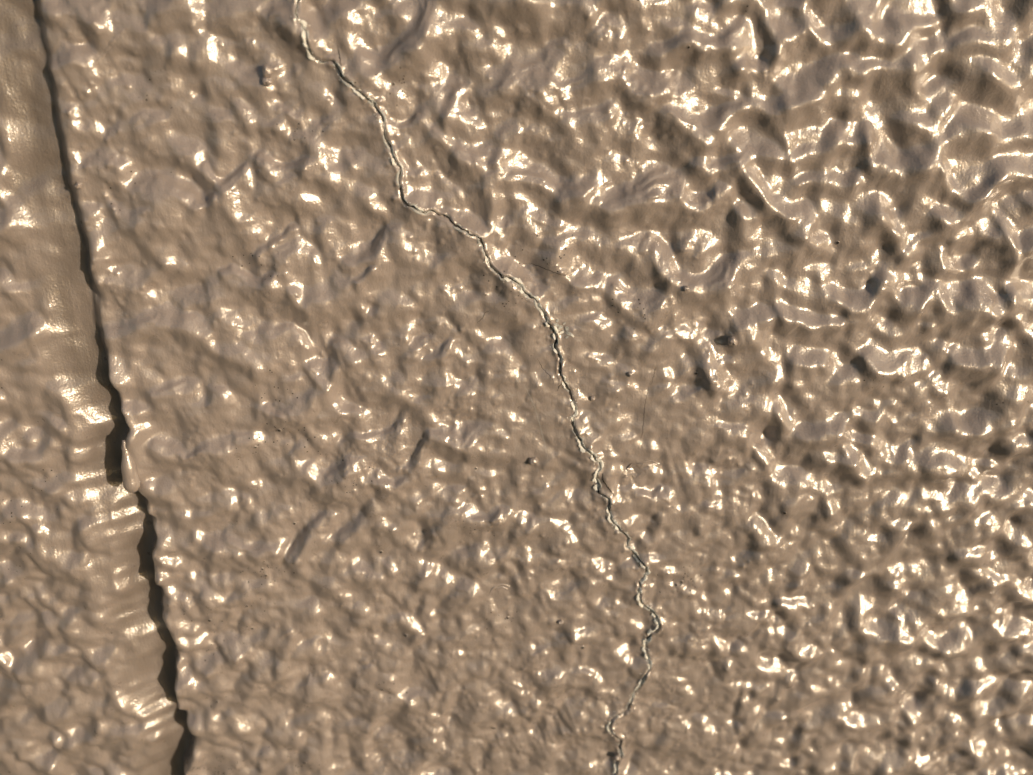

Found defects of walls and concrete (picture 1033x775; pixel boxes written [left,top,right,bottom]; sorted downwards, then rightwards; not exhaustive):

crack [291,0,663,775]